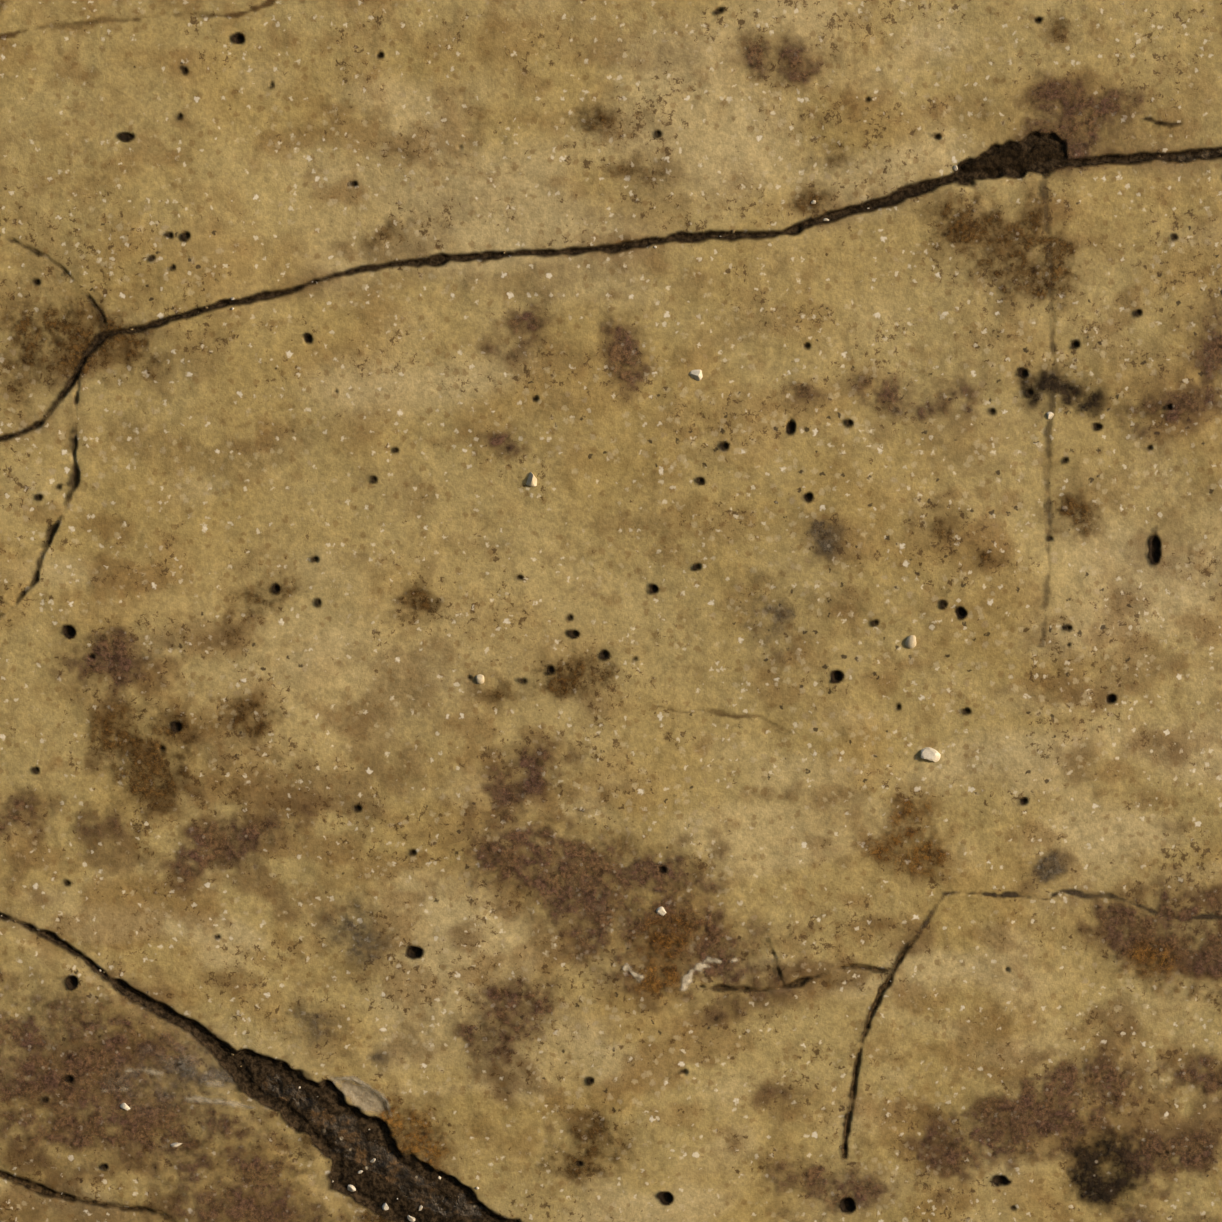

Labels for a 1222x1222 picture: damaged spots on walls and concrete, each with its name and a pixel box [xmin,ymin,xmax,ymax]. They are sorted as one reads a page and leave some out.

crack [0,30,20,38]
crack [210,0,276,17]
crack [0,131,1222,599]
crack [719,711,745,719]
crack [1193,912,1222,920]
crack [700,890,1157,1159]
leakage [0,998,322,1222]
crack [0,913,520,1222]
spalling [332,1077,388,1111]
mould [1068,1134,1150,1205]